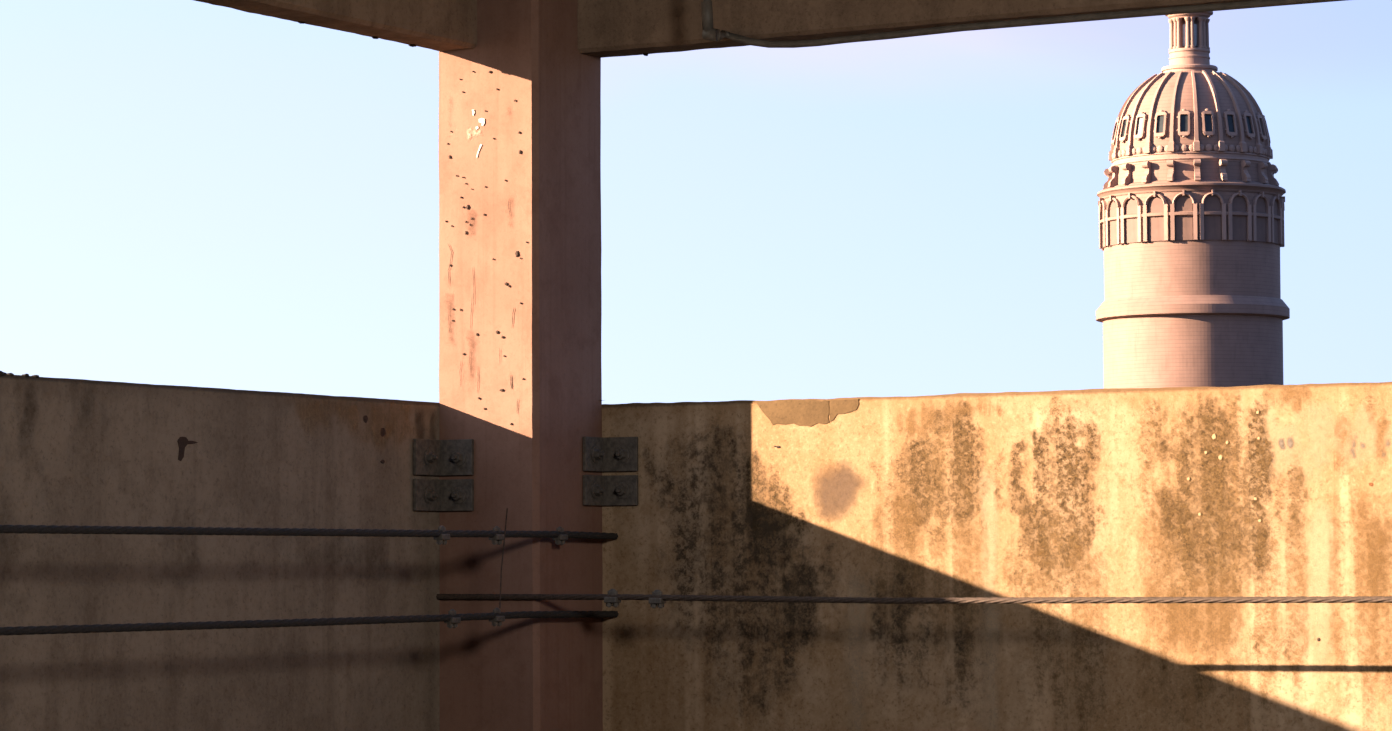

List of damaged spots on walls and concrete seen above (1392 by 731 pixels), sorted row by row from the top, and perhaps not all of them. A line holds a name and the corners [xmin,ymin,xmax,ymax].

water stain [648,427,824,712]
peeling [755,399,859,427]
water stain [820,467,860,515]
water stain [849,397,1103,731]
water stain [1139,396,1390,704]